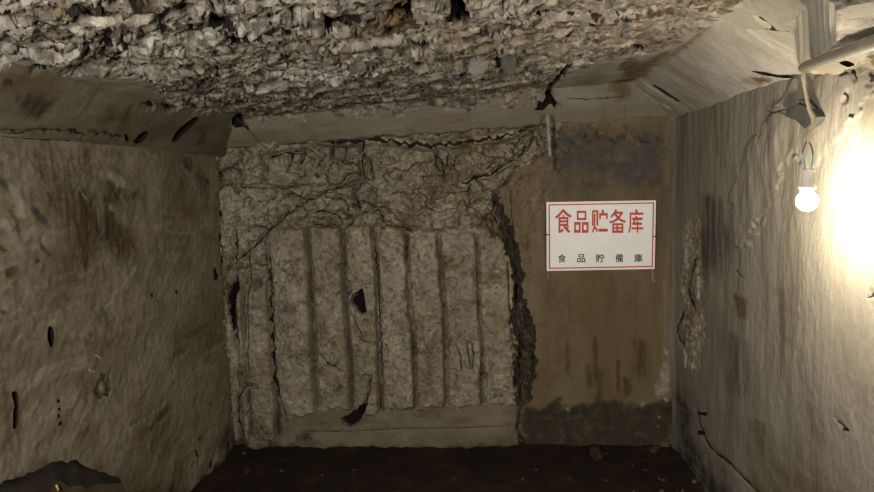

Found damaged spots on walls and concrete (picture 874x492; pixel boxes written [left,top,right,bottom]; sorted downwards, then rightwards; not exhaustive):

crack [0,128,122,142]
spalling [0,0,743,127]
spalling [828,0,874,20]
crack [231,126,534,442]
spalling [213,122,563,450]
leakage [447,236,733,492]